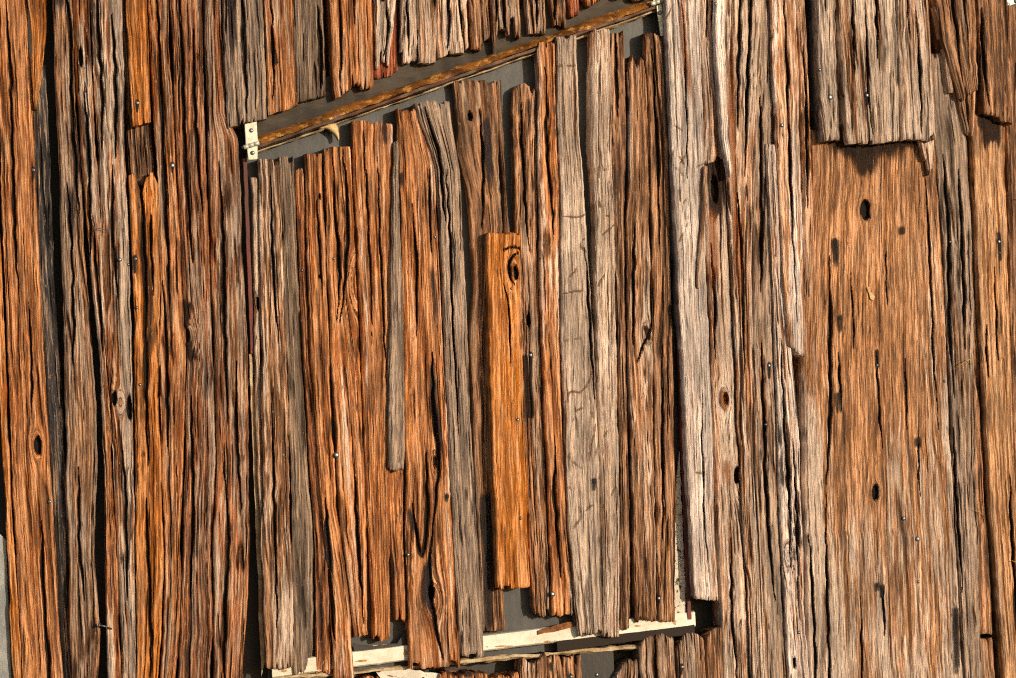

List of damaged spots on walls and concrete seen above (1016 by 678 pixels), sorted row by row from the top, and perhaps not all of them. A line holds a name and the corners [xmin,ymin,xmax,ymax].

crack [412,108,459,658]
crack [495,0,506,30]
crack [503,0,708,574]